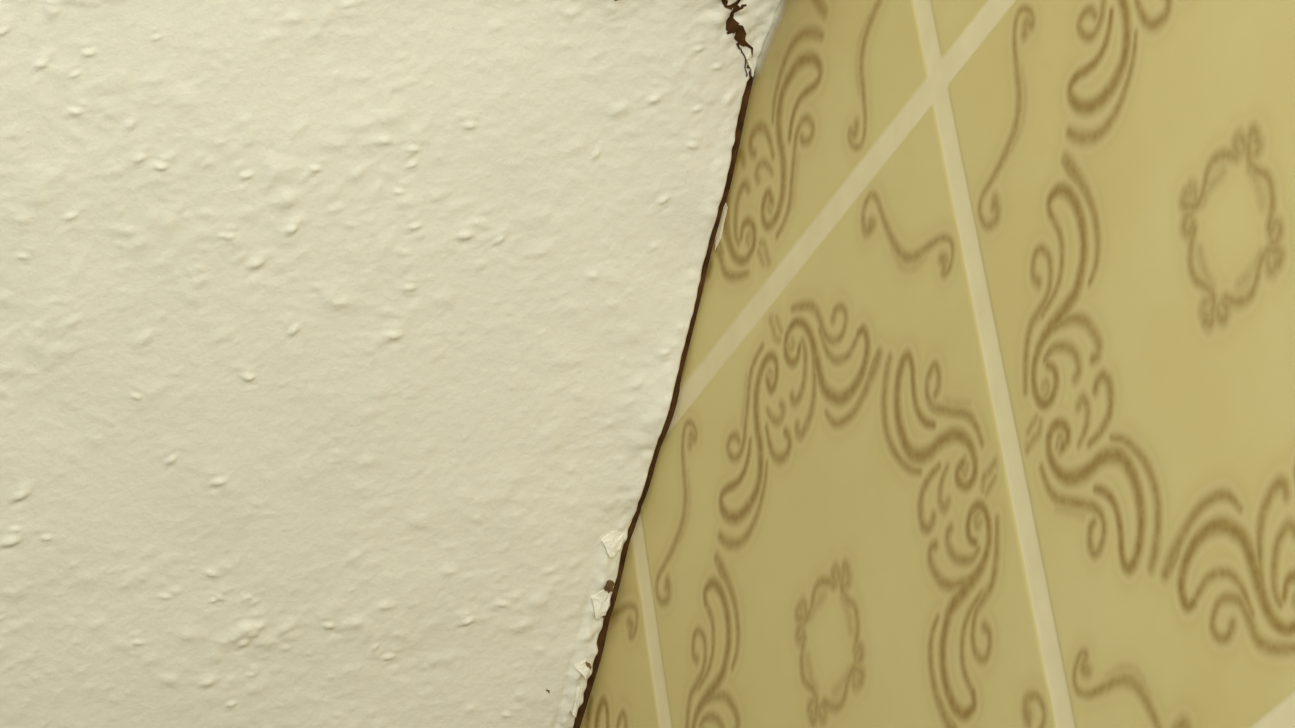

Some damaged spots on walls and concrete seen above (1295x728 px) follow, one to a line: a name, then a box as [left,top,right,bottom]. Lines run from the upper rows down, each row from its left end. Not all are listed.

peeling [715,203,728,250]
crack [573,0,754,728]
peeling [602,531,624,558]
peeling [590,580,614,621]
peeling [571,659,592,717]